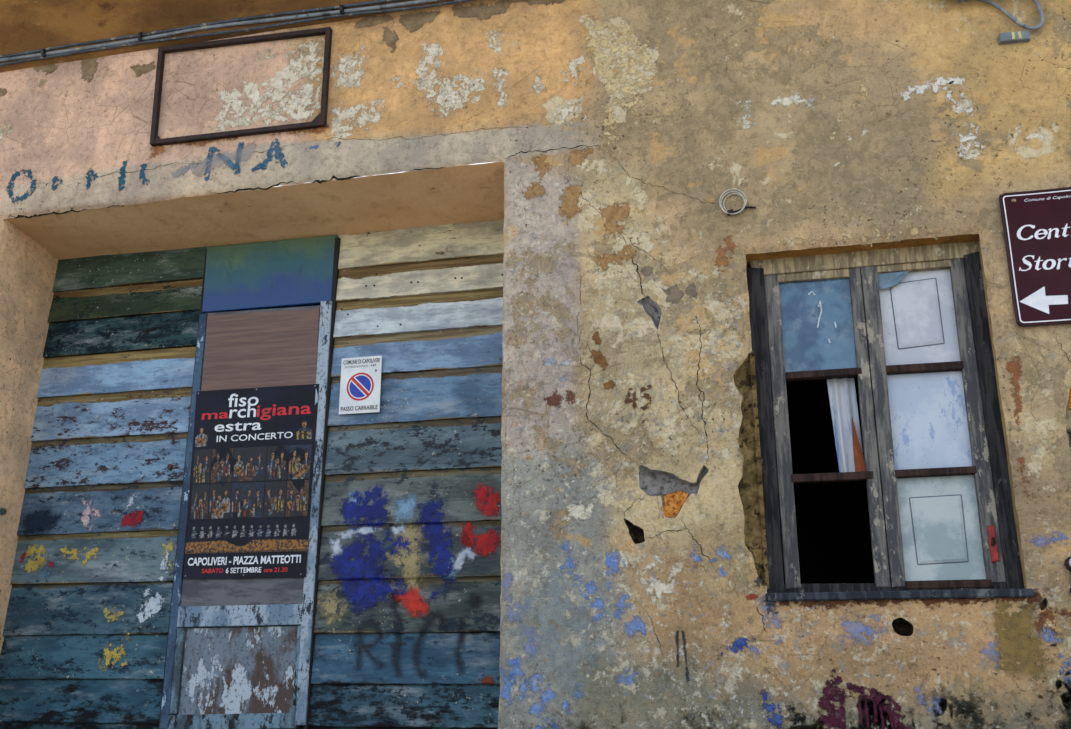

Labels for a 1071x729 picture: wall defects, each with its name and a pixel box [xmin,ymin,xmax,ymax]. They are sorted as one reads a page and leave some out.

flaking render [355,0,565,53]
peeling [211,37,388,141]
peeling [900,75,987,157]
peeling [593,202,653,276]
crack [572,268,636,462]
crack [657,313,708,463]
spalling [639,465,709,519]
crack [648,516,717,572]
water stain [787,703,822,729]
water stain [846,682,912,729]
water stain [933,690,1003,729]
water stain [1047,690,1071,729]